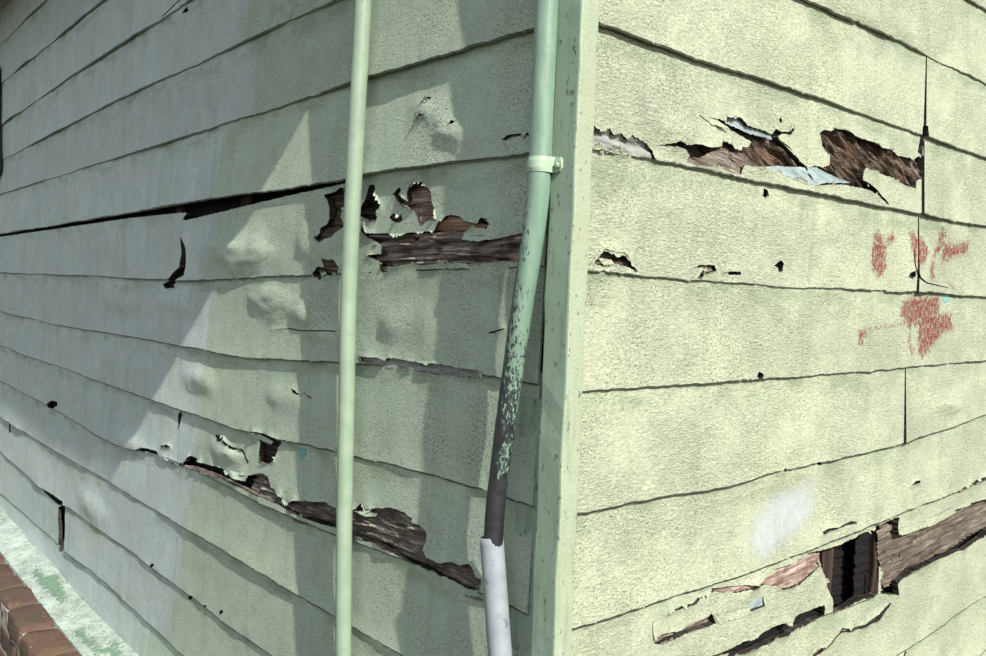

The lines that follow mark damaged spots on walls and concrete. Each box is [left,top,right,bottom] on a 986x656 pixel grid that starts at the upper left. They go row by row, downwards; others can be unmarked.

peeling [660,113,921,203]
spalling [313,188,345,243]
peeling [360,179,522,272]
spalling [308,259,339,280]
peeling [224,469,248,481]
spalling [247,432,281,465]
peeling [355,504,378,517]
spalling [826,507,986,608]
peeling [652,553,821,645]